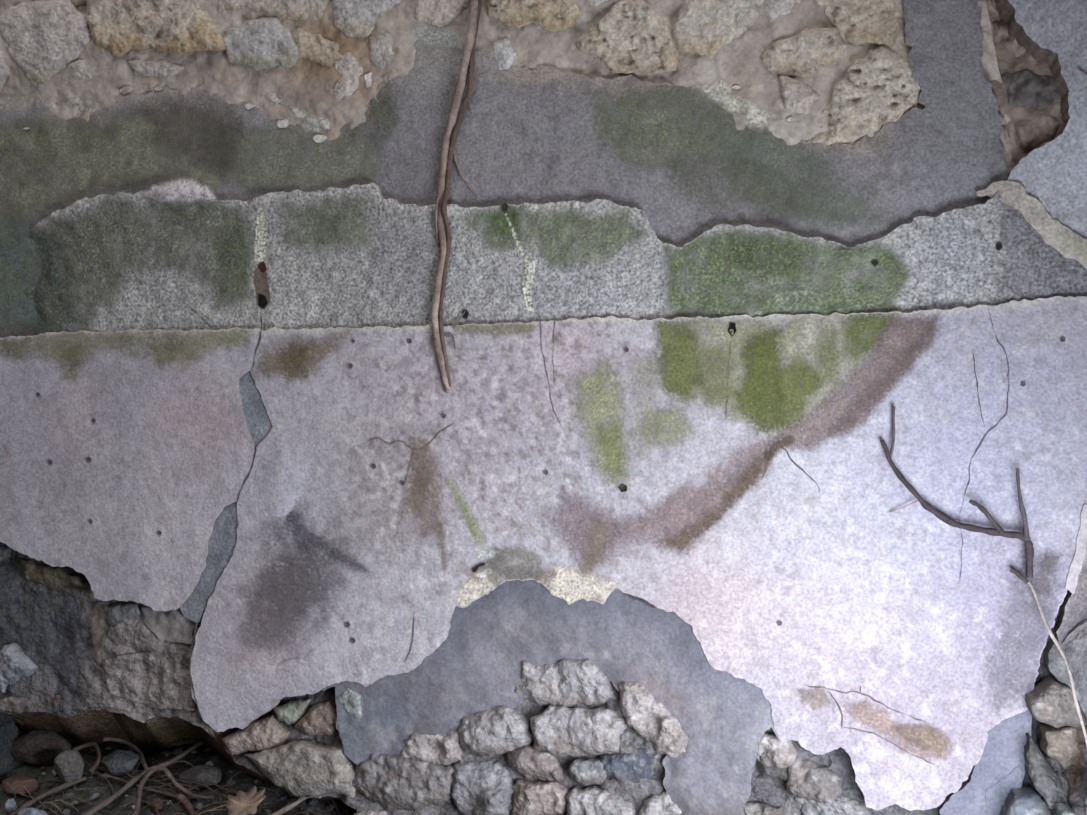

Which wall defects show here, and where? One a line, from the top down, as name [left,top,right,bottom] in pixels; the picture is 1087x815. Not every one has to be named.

leakage [245,93,330,143]
spalling [986,0,1064,165]
efflorescence [147,179,216,202]
efflorescence [254,206,268,265]
crack [180,261,272,720]
leakage [633,317,834,430]
crack [958,304,1010,578]
leakage [255,511,366,642]
spalling [1053,504,1087,648]
spalling [0,542,273,784]
peeling [322,547,779,815]
crack [805,685,937,766]